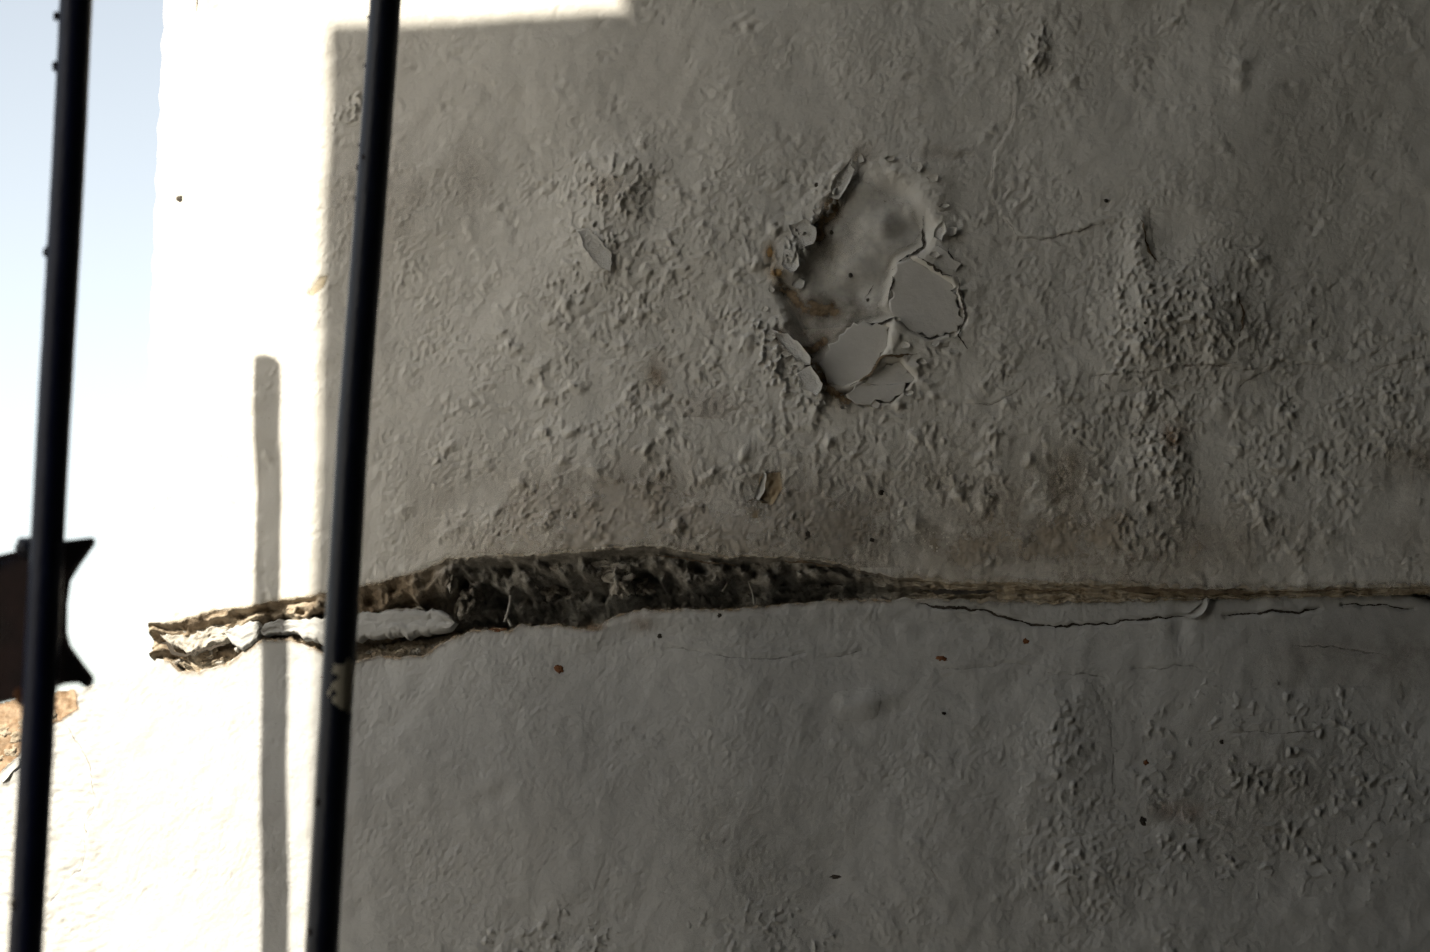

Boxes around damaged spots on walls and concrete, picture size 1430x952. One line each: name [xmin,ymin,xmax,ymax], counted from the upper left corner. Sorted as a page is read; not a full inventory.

peeling [748,154,967,413]
crack [148,546,1430,674]